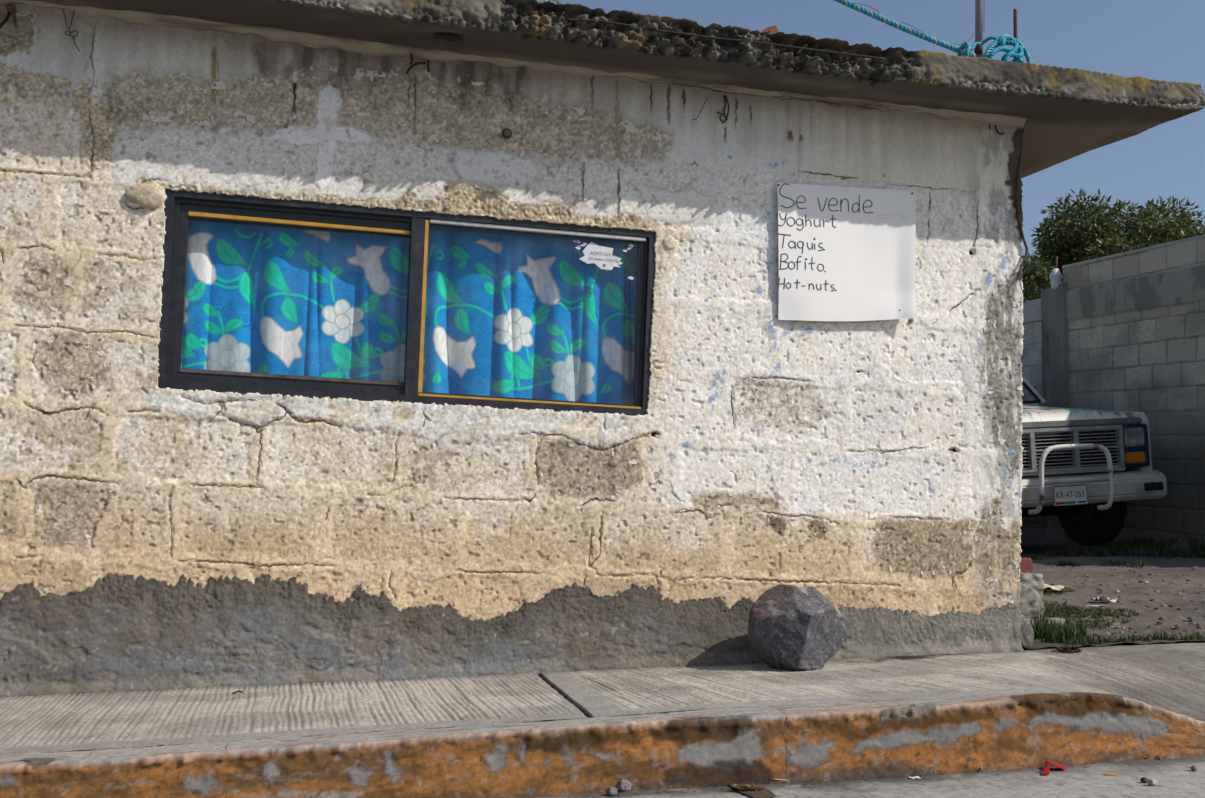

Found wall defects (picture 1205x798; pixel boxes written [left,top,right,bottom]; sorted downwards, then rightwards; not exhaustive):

crack [0,245,51,263]
crack [25,403,156,419]
crack [371,411,430,496]
crack [169,396,341,567]
crack [18,474,117,545]
crack [458,567,541,575]
peeling [852,692,1167,753]
peeling [677,729,762,770]
peeling [788,742,834,767]